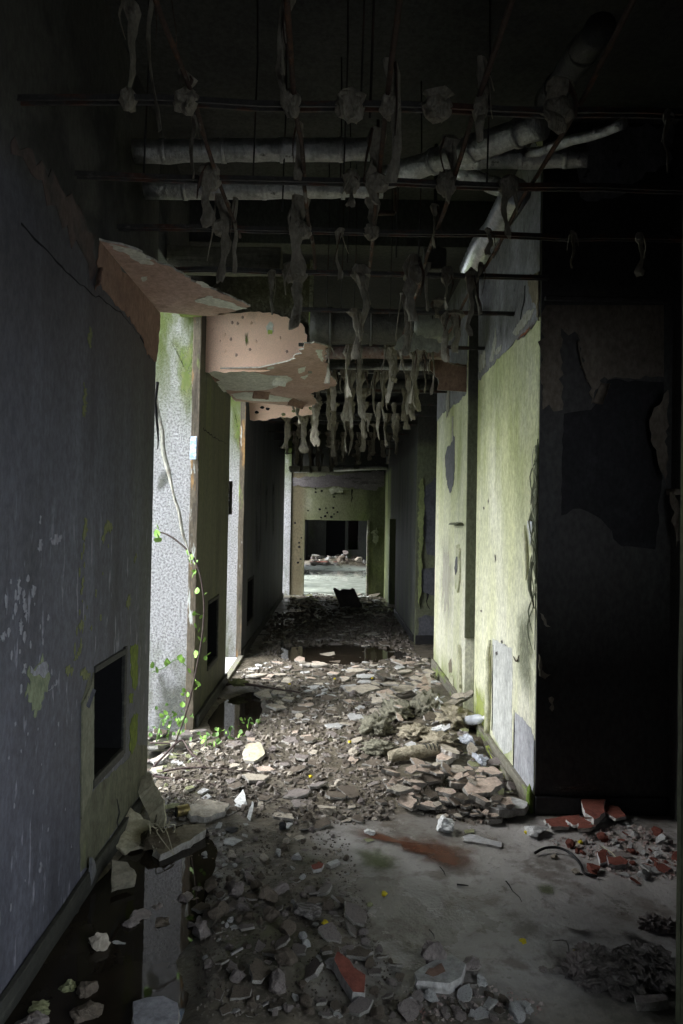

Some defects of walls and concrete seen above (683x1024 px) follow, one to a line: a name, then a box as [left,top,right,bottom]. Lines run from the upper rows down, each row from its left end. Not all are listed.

crack [21,222,144,343]
peeling [95,242,160,362]
peeling [195,281,247,310]
peeling [209,366,309,409]
peeling [417,170,542,652]
peeling [561,379,664,549]